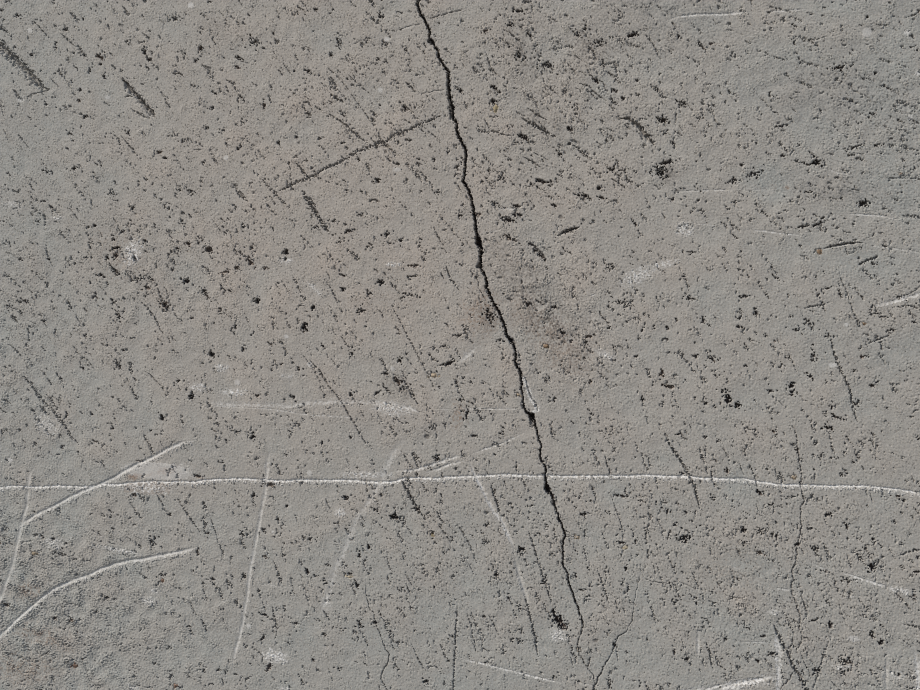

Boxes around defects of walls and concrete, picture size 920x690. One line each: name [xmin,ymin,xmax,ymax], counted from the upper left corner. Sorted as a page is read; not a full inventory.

crack [351,0,700,690]